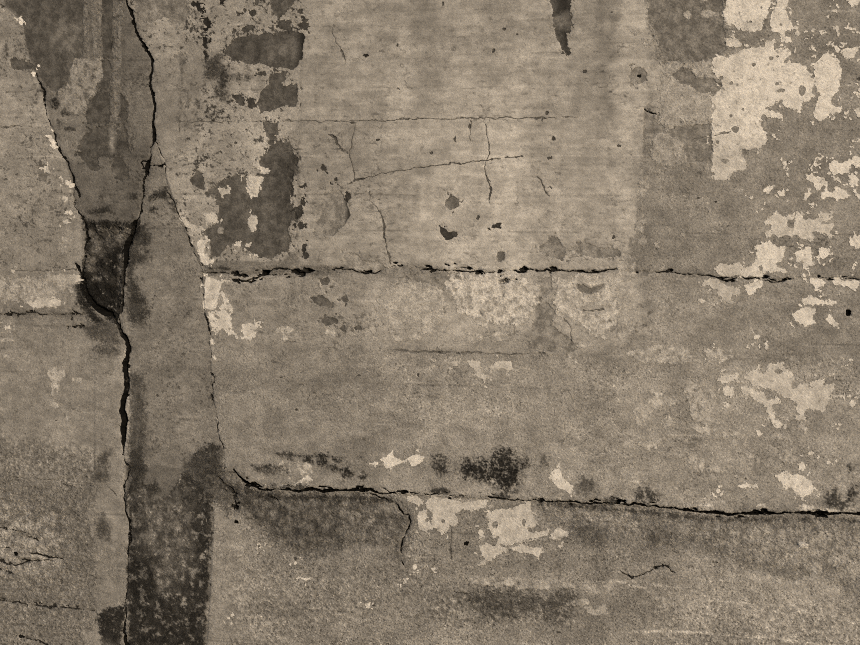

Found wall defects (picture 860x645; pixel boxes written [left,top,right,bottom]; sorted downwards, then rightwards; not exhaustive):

crack [0,0,166,645]
leakage [83,207,152,325]
leakage [149,186,176,213]
peeling [179,0,351,360]
crack [167,113,791,565]
peeling [642,0,860,181]
peeling [698,138,860,329]
leakage [86,373,393,645]
leakage [461,447,528,499]
spalling [227,463,860,592]
crack [622,564,675,579]
crack [488,493,860,518]